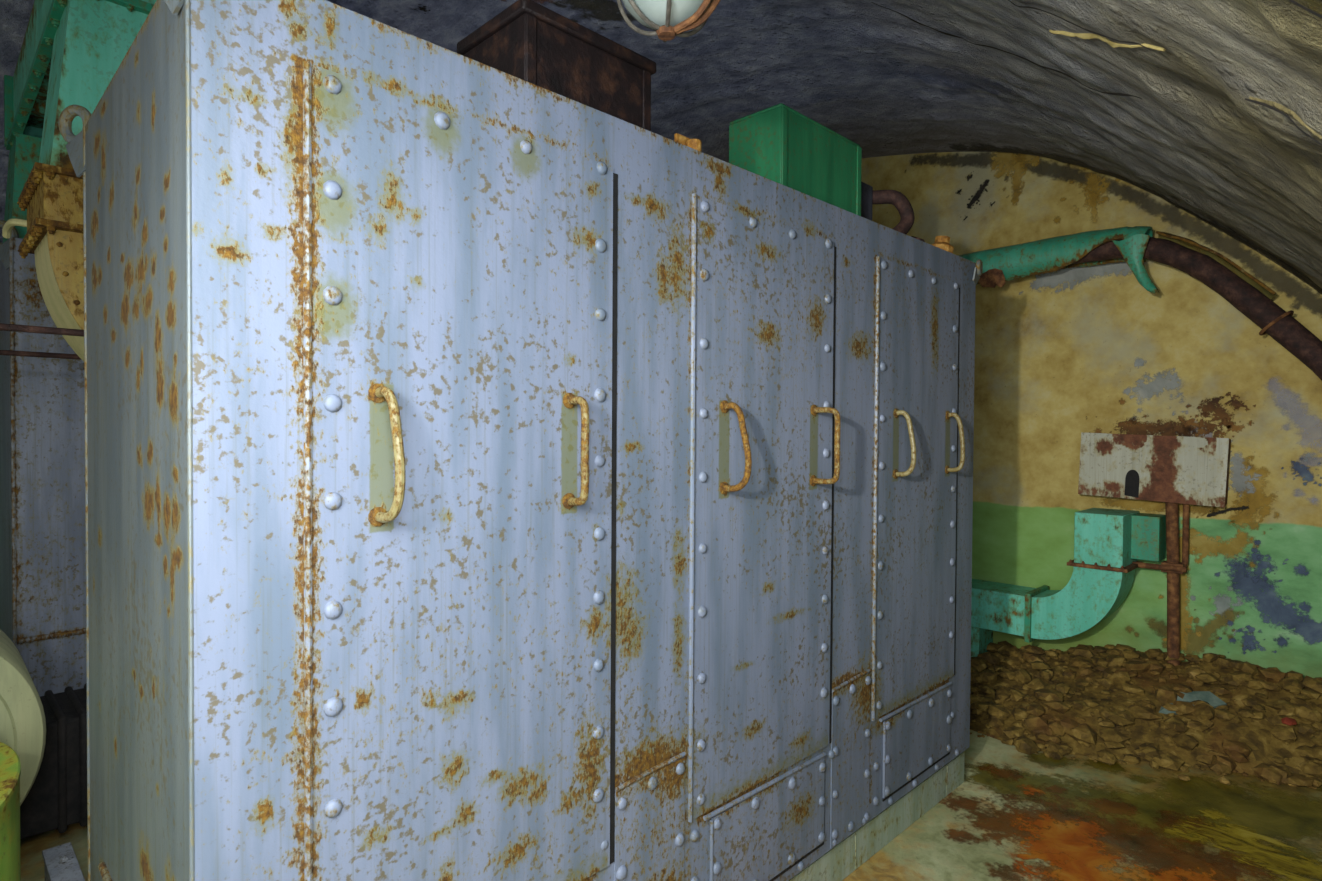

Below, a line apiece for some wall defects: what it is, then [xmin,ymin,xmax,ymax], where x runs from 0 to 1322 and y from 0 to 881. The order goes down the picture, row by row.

peeling [1281,453,1322,486]
peeling [1210,540,1322,654]
corrosion [939,764,1281,881]